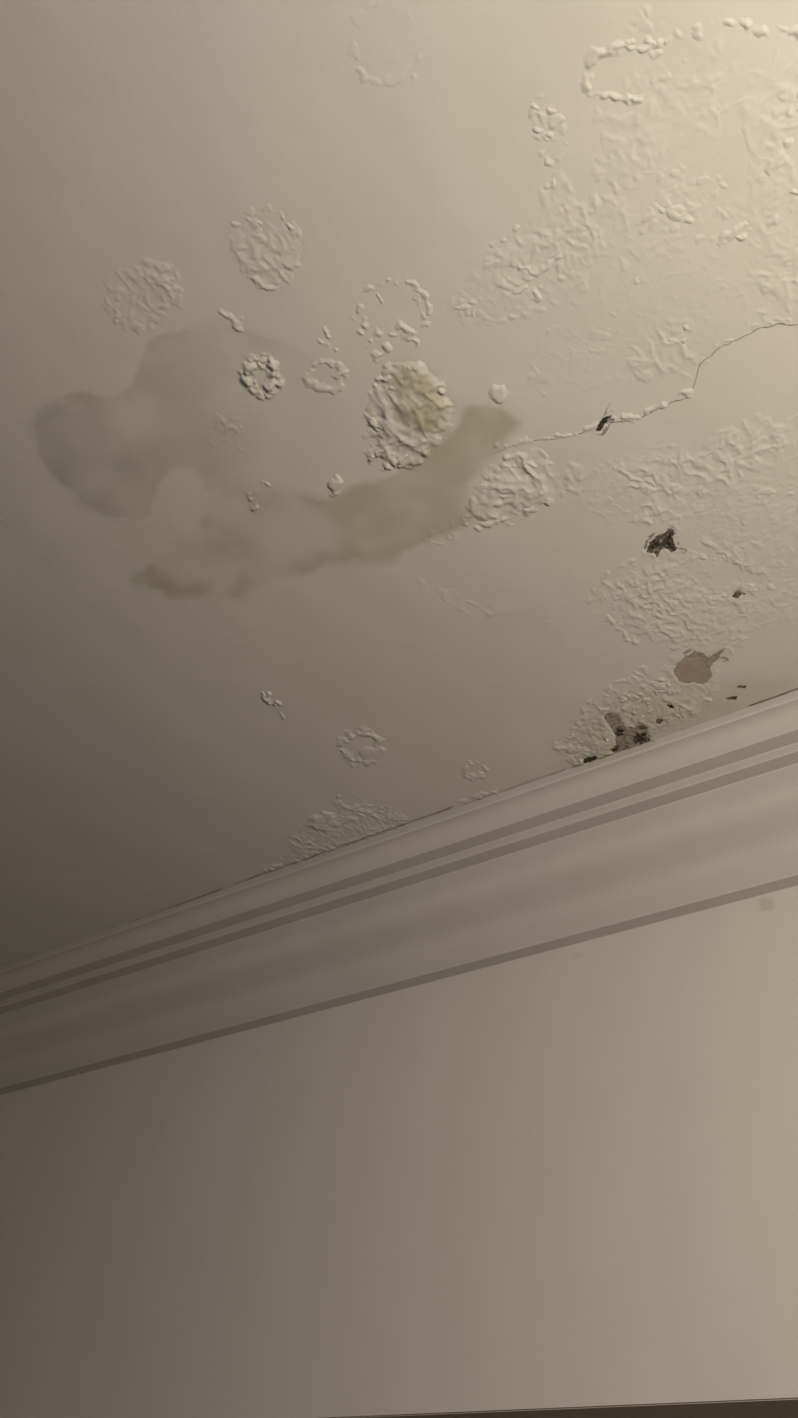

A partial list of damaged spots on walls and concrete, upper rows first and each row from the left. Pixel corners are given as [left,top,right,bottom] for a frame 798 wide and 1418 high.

crack [488,317,798,455]